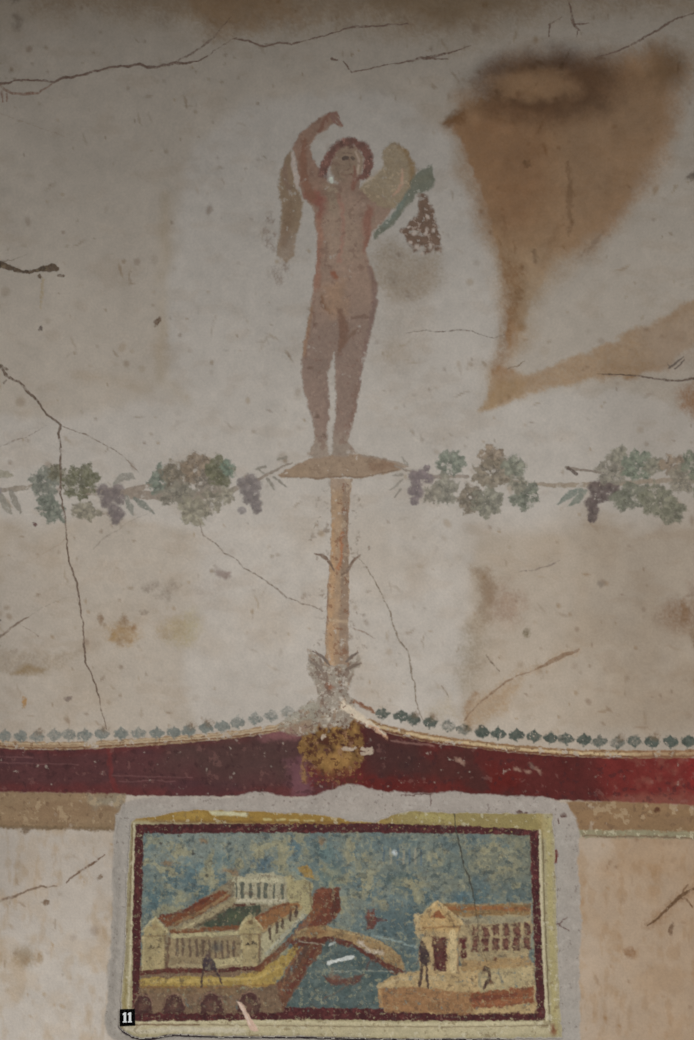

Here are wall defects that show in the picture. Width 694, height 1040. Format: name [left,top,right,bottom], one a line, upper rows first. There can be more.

crack [0,16,472,103]
water stain [14,0,694,416]
crack [0,363,139,730]
crack [141,518,324,612]
crack [347,556,582,725]
crack [0,853,106,903]